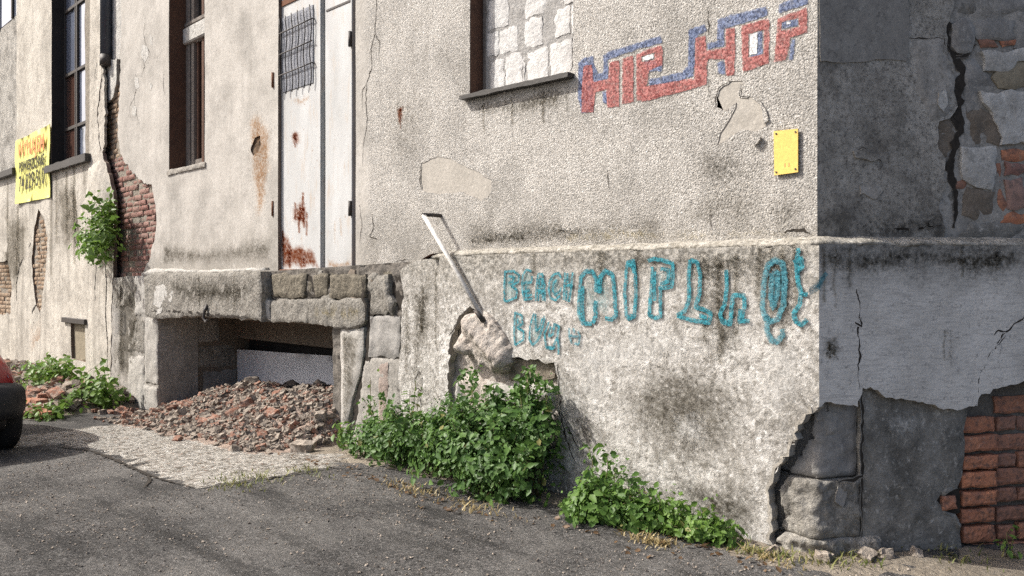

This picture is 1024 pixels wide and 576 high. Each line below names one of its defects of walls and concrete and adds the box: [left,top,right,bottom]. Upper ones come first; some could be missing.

flaking render [84,0,156,278]
peeling [714,80,769,146]
flaking render [911,0,1024,238]
flaking render [0,262,12,314]
flaking render [33,213,48,309]
corrosion [281,196,315,268]
damp [924,252,1014,270]
spalling [451,308,561,449]
spalling [766,403,839,545]
crack [838,289,865,538]
flaking render [937,381,1024,545]
crack [975,316,1024,406]